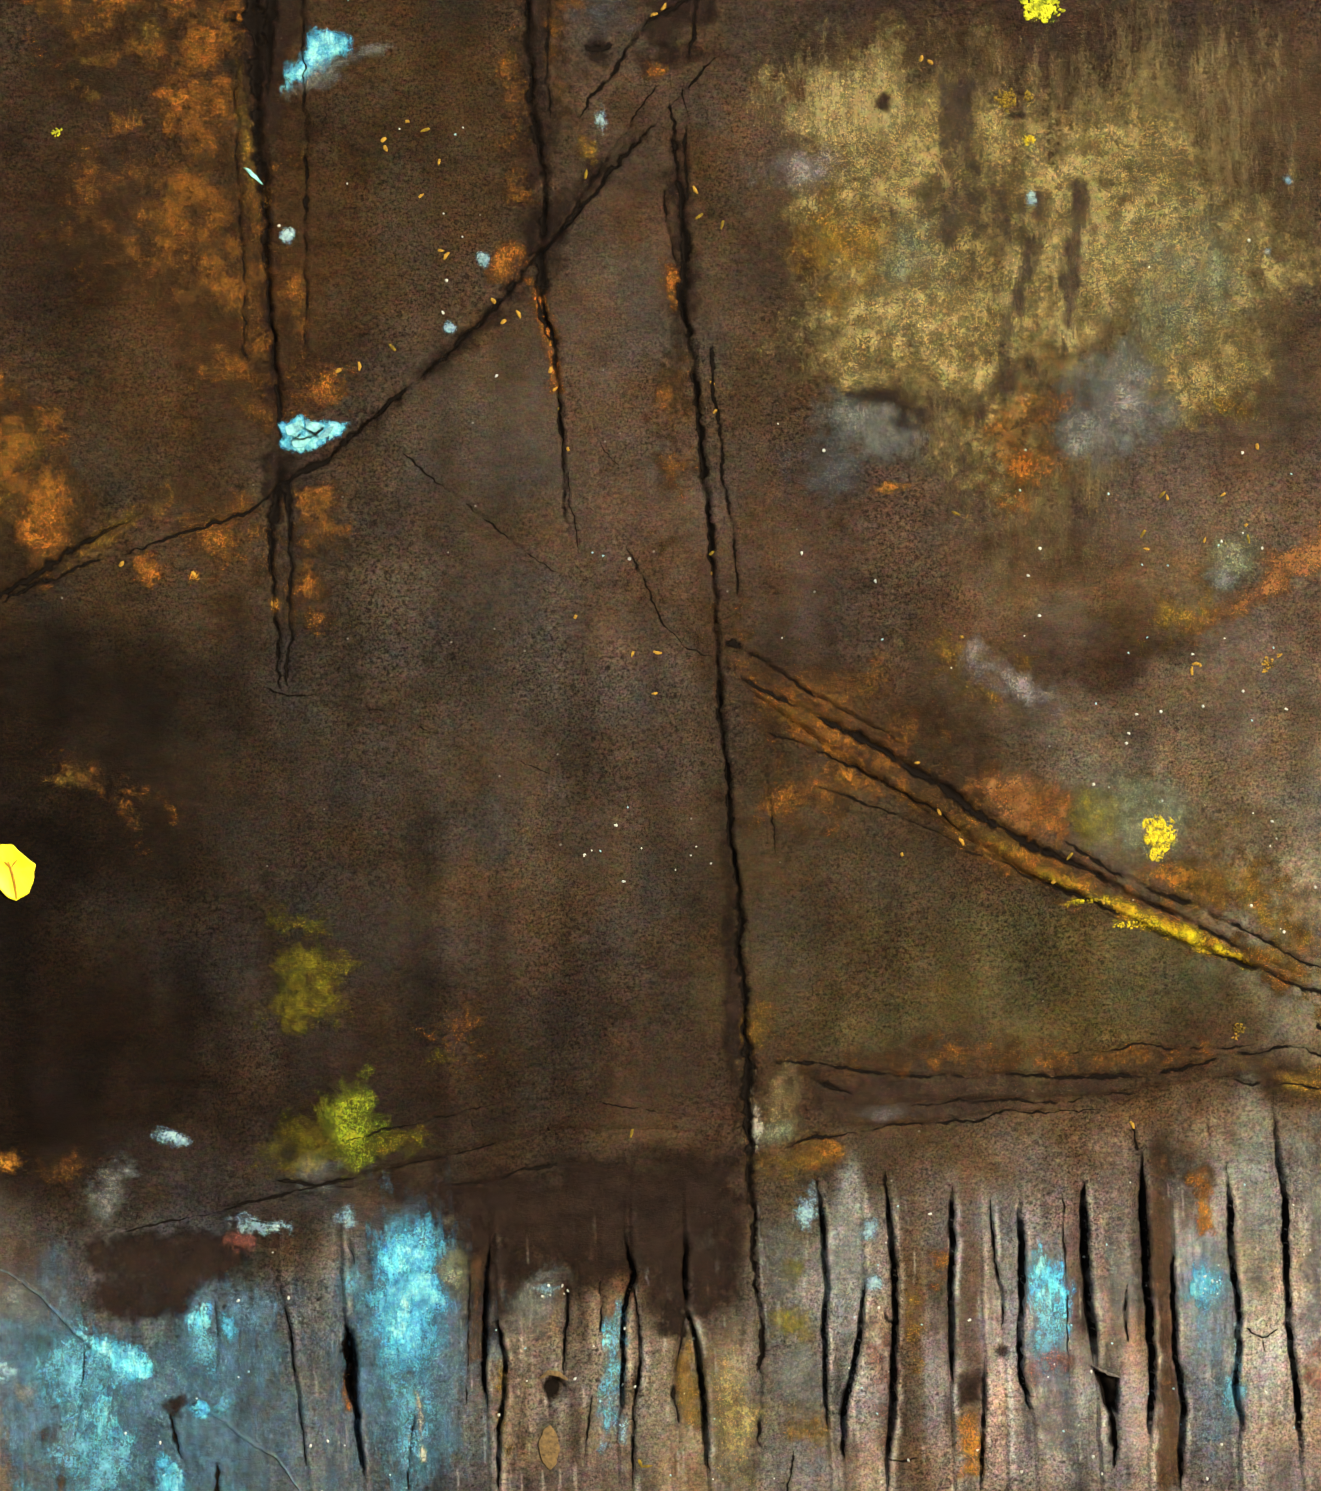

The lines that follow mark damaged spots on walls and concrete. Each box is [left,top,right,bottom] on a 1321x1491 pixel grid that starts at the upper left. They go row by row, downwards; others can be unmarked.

corrosion [25,0,347,414]
crack [0,0,739,696]
corrosion [134,484,351,635]
corrosion [1155,524,1321,644]
crack [626,548,1321,1491]
damp [157,1131,189,1146]
damp [230,1213,290,1234]
damp [53,1331,152,1456]
damp [162,1395,186,1417]
crack [340,1326,365,1476]
crack [466,1246,508,1489]
crack [562,1242,711,1484]